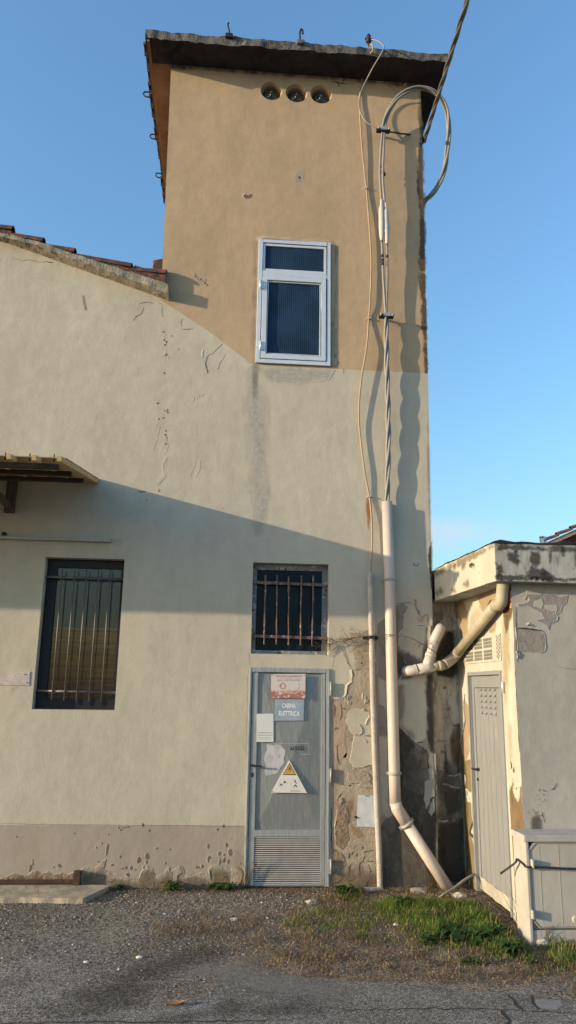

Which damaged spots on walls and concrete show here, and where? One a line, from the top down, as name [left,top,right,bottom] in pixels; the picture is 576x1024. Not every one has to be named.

damp [428,543,489,596]
damp [549,546,576,564]
damp [381,632,466,888]
flaking render [330,585,568,909]
spalling [0,824,245,889]